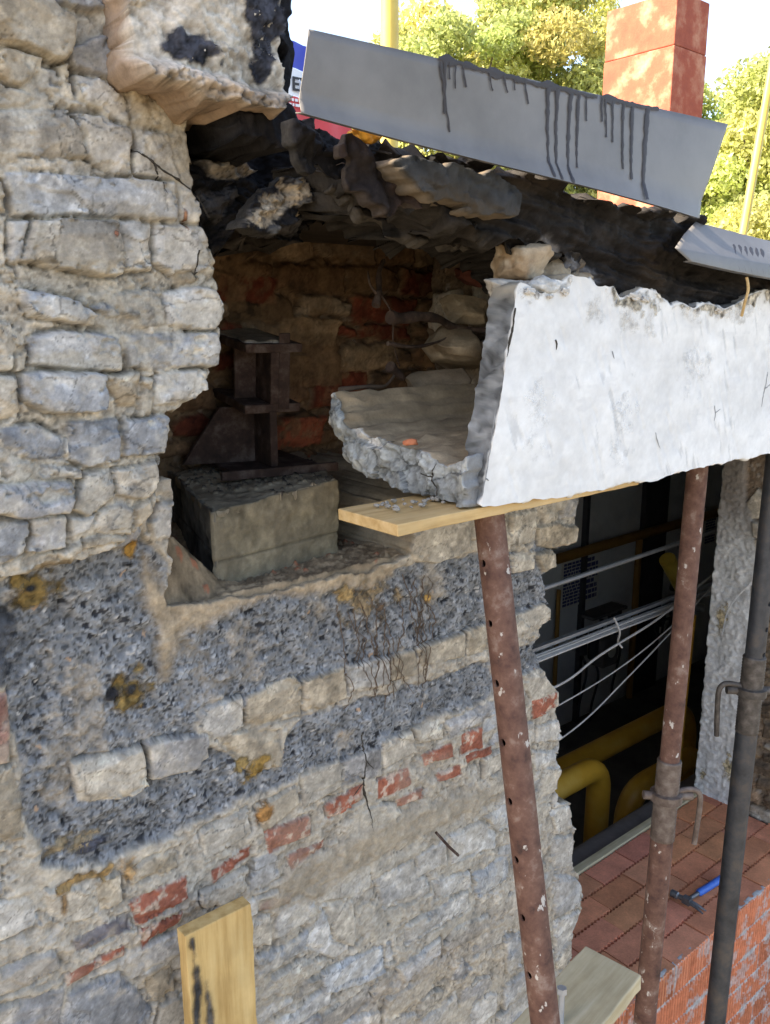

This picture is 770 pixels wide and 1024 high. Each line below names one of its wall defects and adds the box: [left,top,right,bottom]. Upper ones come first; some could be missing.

spalling [158,343,234,478]
spalling [212,242,436,458]
spalling [522,276,573,299]
crack [354,732,374,831]